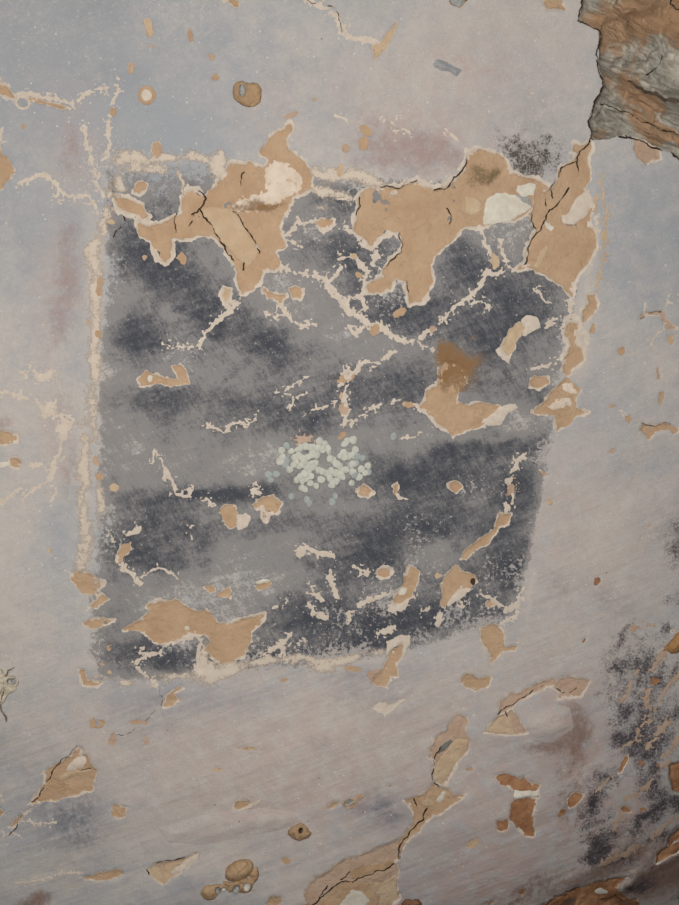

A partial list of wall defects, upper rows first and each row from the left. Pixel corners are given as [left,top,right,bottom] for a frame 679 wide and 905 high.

peeling [301,0,398,61]
leakage [498,135,560,177]
crack [524,0,679,265]
peeling [632,136,662,165]
peeling [0,62,612,709]
peeling [483,675,591,737]
peeling [557,636,679,832]
peeling [0,746,97,839]
peeling [302,712,473,905]
peeling [494,773,541,838]
peeling [599,815,679,867]
peeling [541,876,640,905]